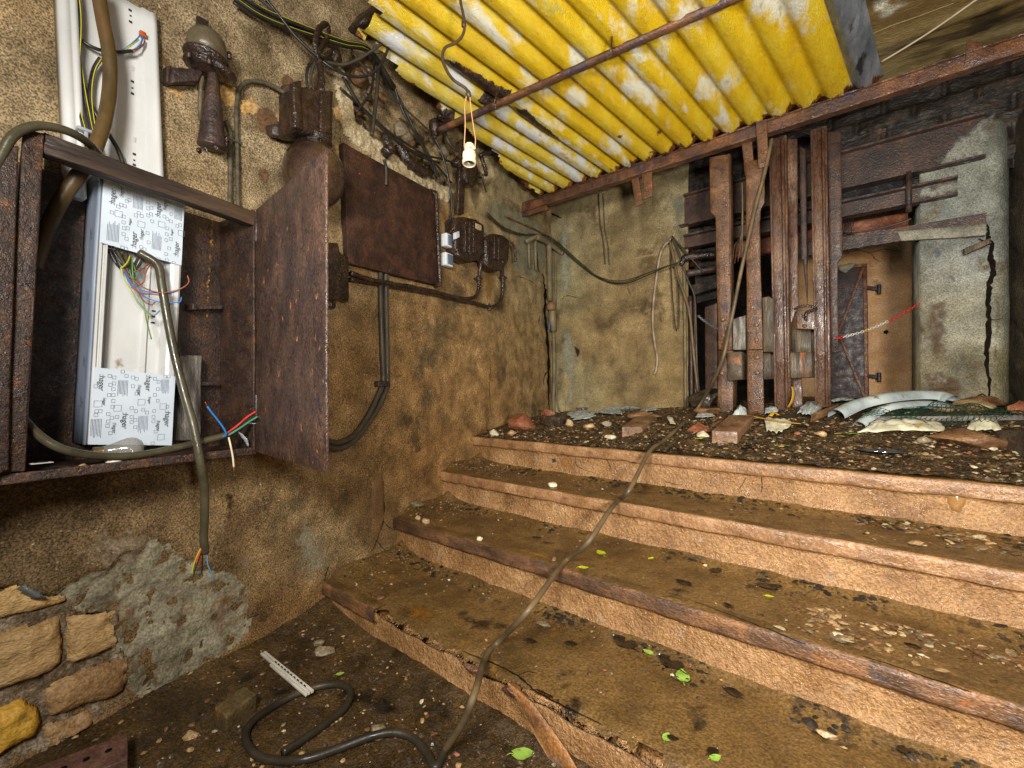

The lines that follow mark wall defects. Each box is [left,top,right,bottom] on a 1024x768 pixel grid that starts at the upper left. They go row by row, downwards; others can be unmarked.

crack [517,252,577,407]
crack [978,224,1003,396]
spalling [17,537,252,698]
peeling [501,681,577,768]